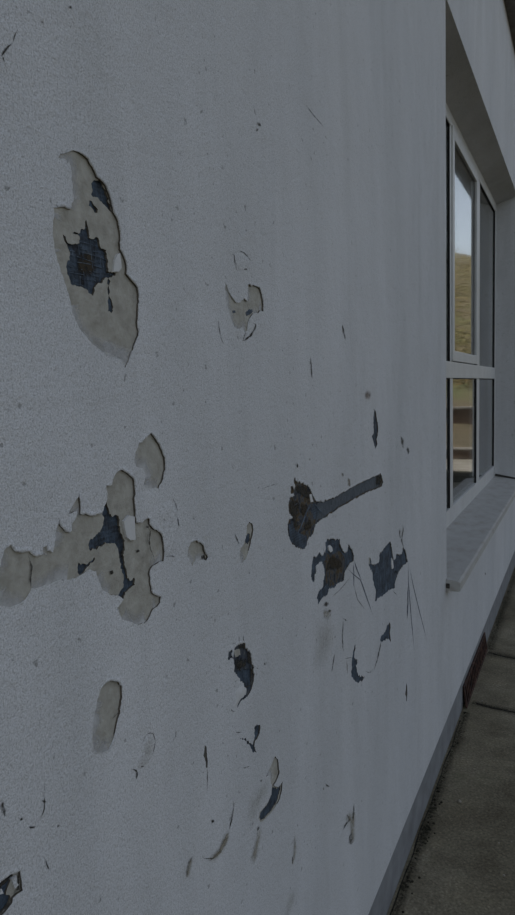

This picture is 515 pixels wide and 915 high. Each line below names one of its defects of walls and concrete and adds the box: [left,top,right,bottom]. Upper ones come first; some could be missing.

peeling [53,149,141,367]
peeling [225,282,264,341]
peeling [0,430,167,625]
peeling [187,537,209,566]
peeling [288,471,384,618]
peeling [369,528,408,601]
peeling [228,637,265,712]
peeling [346,623,391,683]
peeling [92,676,125,753]
peeling [254,757,283,856]
peeling [0,864,24,915]